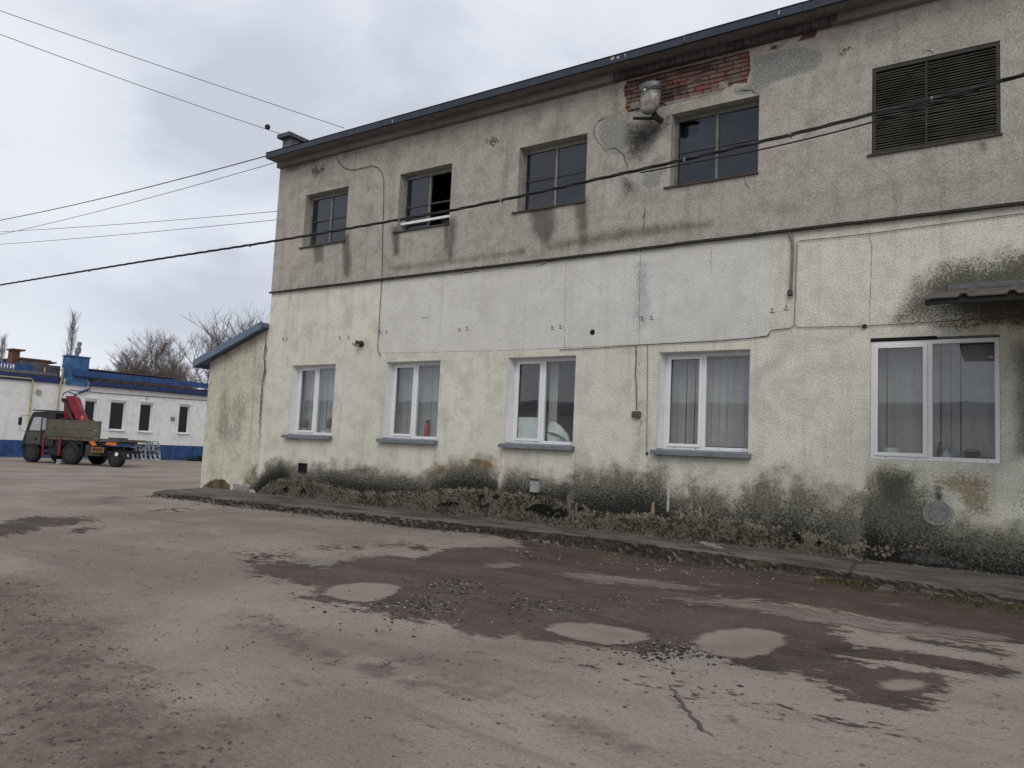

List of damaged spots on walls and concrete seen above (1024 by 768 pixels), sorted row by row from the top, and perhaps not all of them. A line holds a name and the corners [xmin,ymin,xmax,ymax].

spalling [601,31,823,154]
water stain [894,248,1024,327]
crack [259,322,269,440]
water stain [246,459,1024,577]